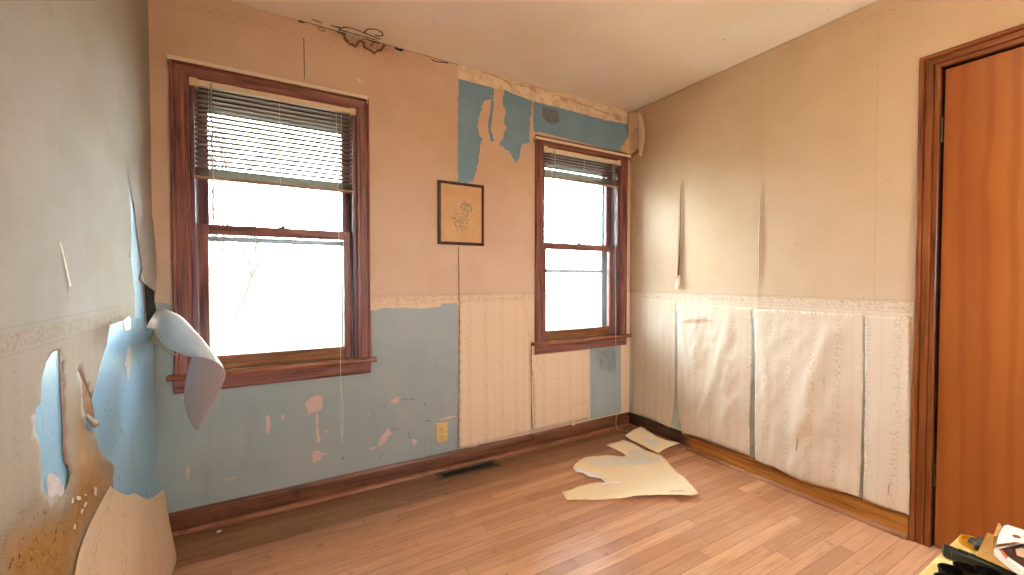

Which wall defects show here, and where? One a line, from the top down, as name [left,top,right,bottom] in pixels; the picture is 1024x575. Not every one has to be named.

flaking render [458,64,630,123]
peeling [305,395,328,463]
leakage [0,398,111,575]